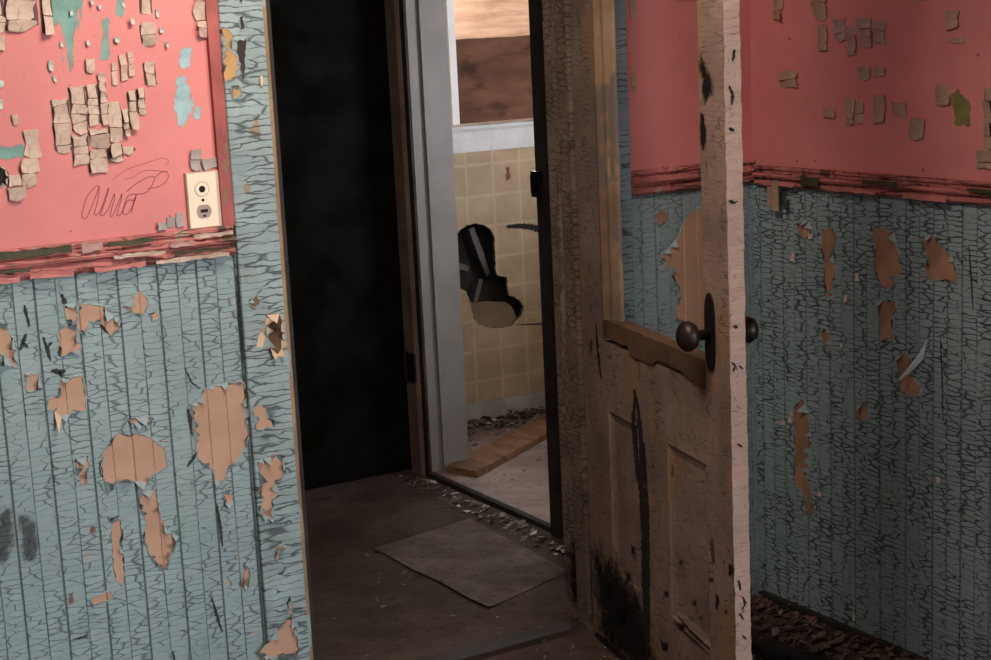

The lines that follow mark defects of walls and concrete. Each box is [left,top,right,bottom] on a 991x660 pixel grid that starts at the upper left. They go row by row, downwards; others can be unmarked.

peeling [0,0,64,50]
peeling [50,0,169,173]
peeling [0,81,42,201]
peeling [0,212,233,284]
crack [19,305,66,378]
crack [236,276,244,364]
crack [968,246,991,377]
peeling [75,415,179,573]
crack [185,368,200,467]
crack [215,504,223,547]
peeling [190,381,286,523]
crack [211,598,223,633]